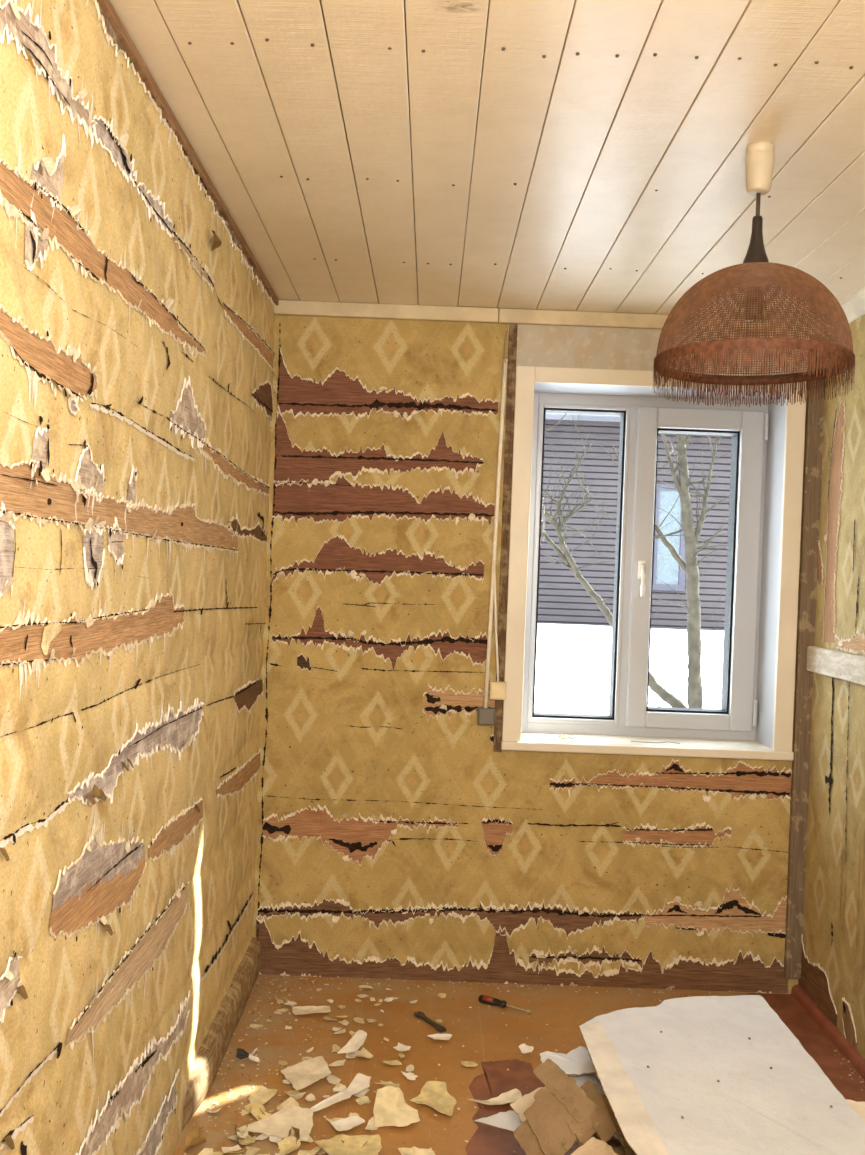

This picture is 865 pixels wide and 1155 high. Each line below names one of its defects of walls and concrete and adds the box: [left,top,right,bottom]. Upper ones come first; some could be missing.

peeling [119,132,130,159]
peeling [39,157,55,176]
peeling [78,516,106,535]
peeling [86,789,107,805]
peeling [99,915,113,936]
peeling [5,949,28,999]
peeling [747,993,865,1102]